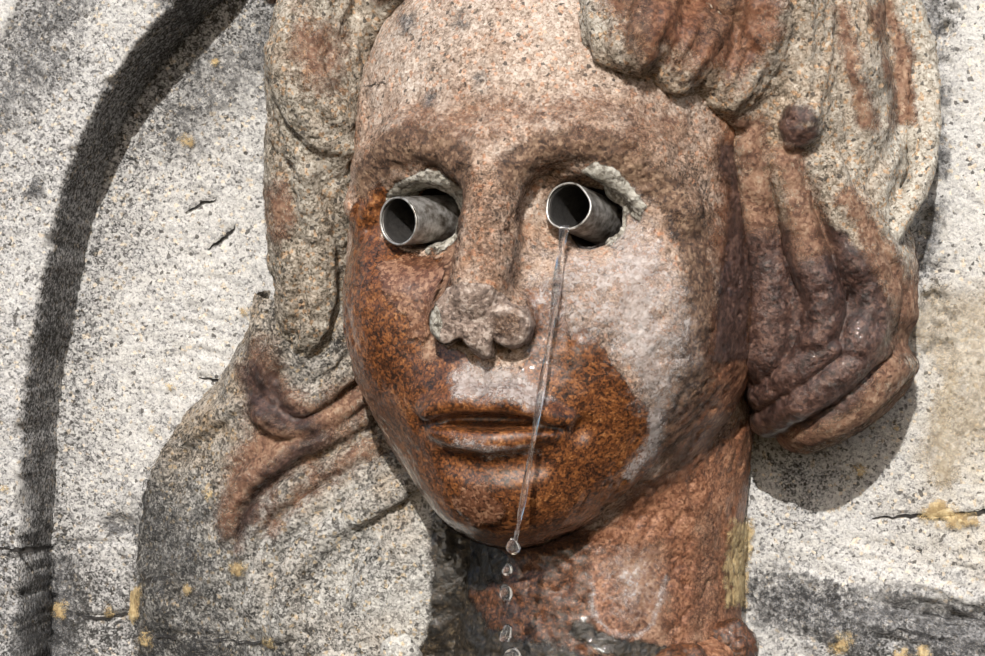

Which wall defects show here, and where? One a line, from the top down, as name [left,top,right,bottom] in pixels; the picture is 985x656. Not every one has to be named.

leakage [910,300,985,355]
crack [872,509,985,519]
crack [0,546,53,554]